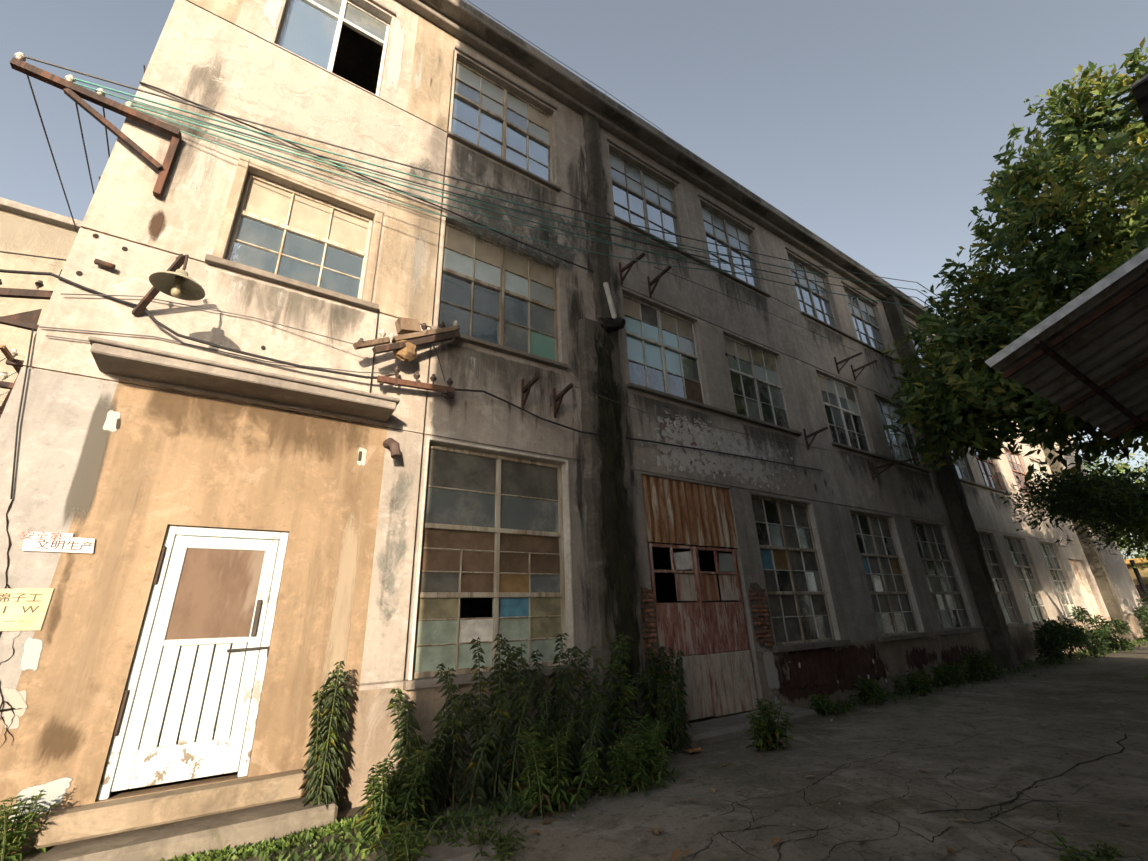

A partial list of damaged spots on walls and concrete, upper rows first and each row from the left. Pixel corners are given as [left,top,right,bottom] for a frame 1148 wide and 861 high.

leakage [182,67,218,157]
peeling [638,410,795,491]
crack [4,499,13,589]
leakage [595,334,708,722]
peeling [749,582,889,702]
crack [0,631,28,745]
leakage [42,724,73,755]